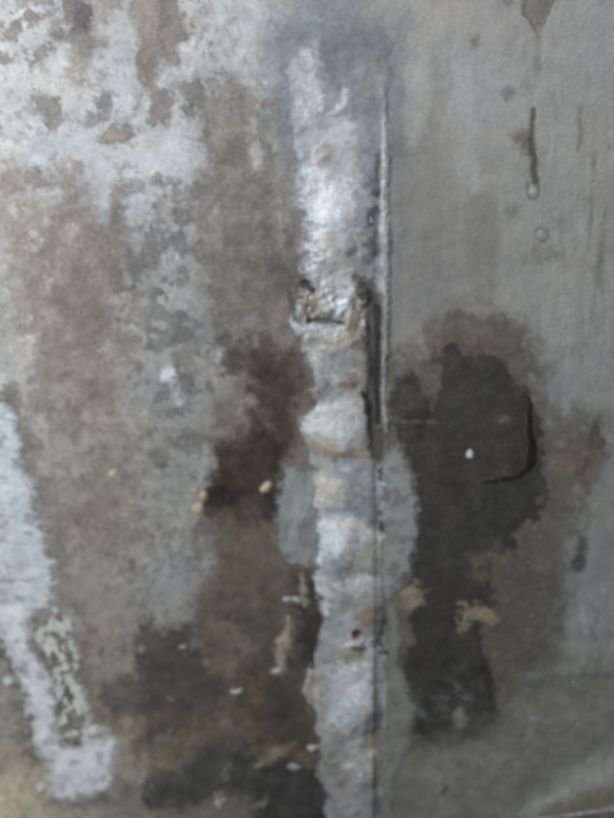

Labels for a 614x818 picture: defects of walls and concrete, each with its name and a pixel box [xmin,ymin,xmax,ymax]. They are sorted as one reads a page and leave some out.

damp [51,0,185,94]
damp [514,108,539,199]
damp [0,161,134,437]
crack [482,398,537,483]